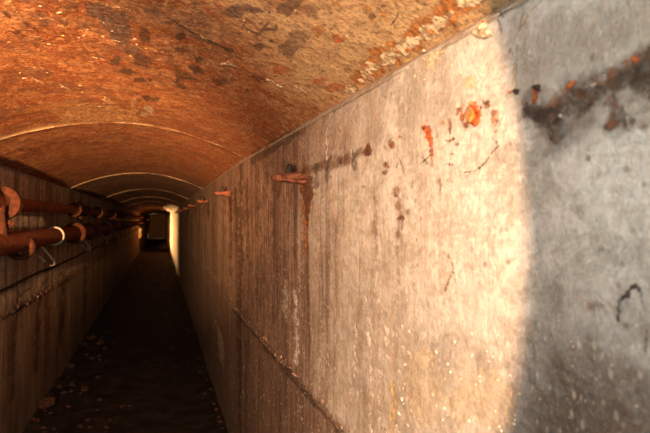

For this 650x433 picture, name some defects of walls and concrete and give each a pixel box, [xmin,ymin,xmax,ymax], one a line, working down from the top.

peeling [344,0,485,95]
corrosion [532,84,541,104]
water stain [522,47,650,144]
corrosion [422,125,433,164]
corrosion [300,176,314,254]
efflorescence [283,290,300,366]
crack [617,283,641,322]